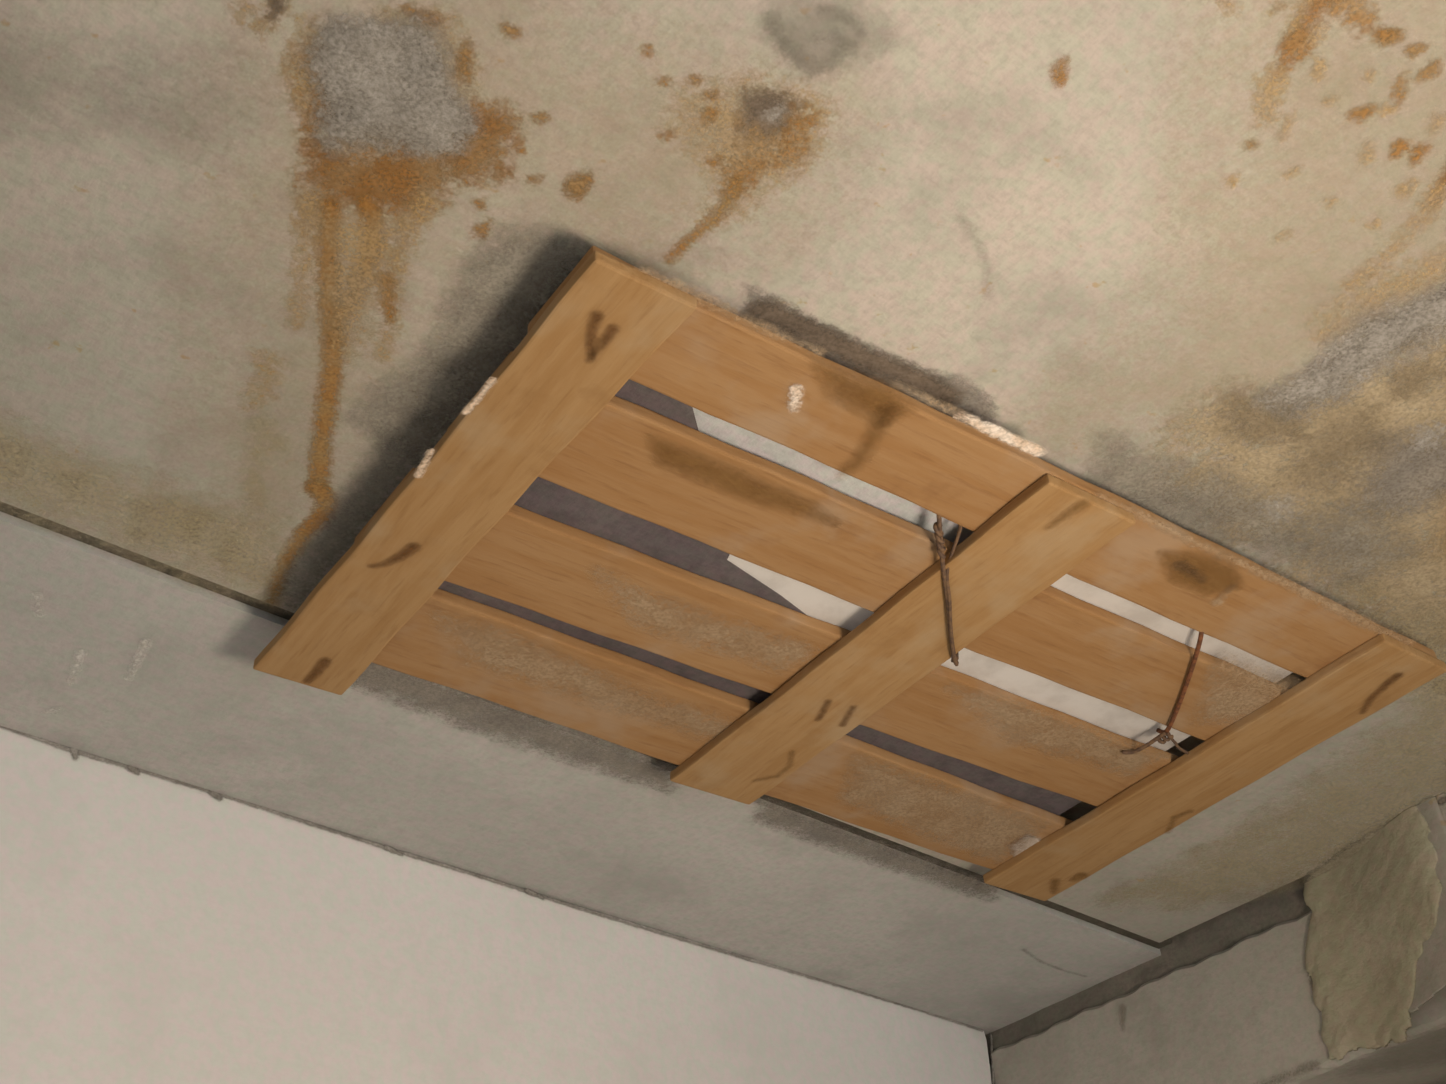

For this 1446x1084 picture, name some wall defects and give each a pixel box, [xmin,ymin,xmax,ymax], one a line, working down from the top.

rust [660,76,830,263]
rust [1053,59,1067,87]
rust [1255,0,1440,125]
rust [1391,139,1429,162]
rust [242,0,548,605]
water stain [1094,325,1446,692]